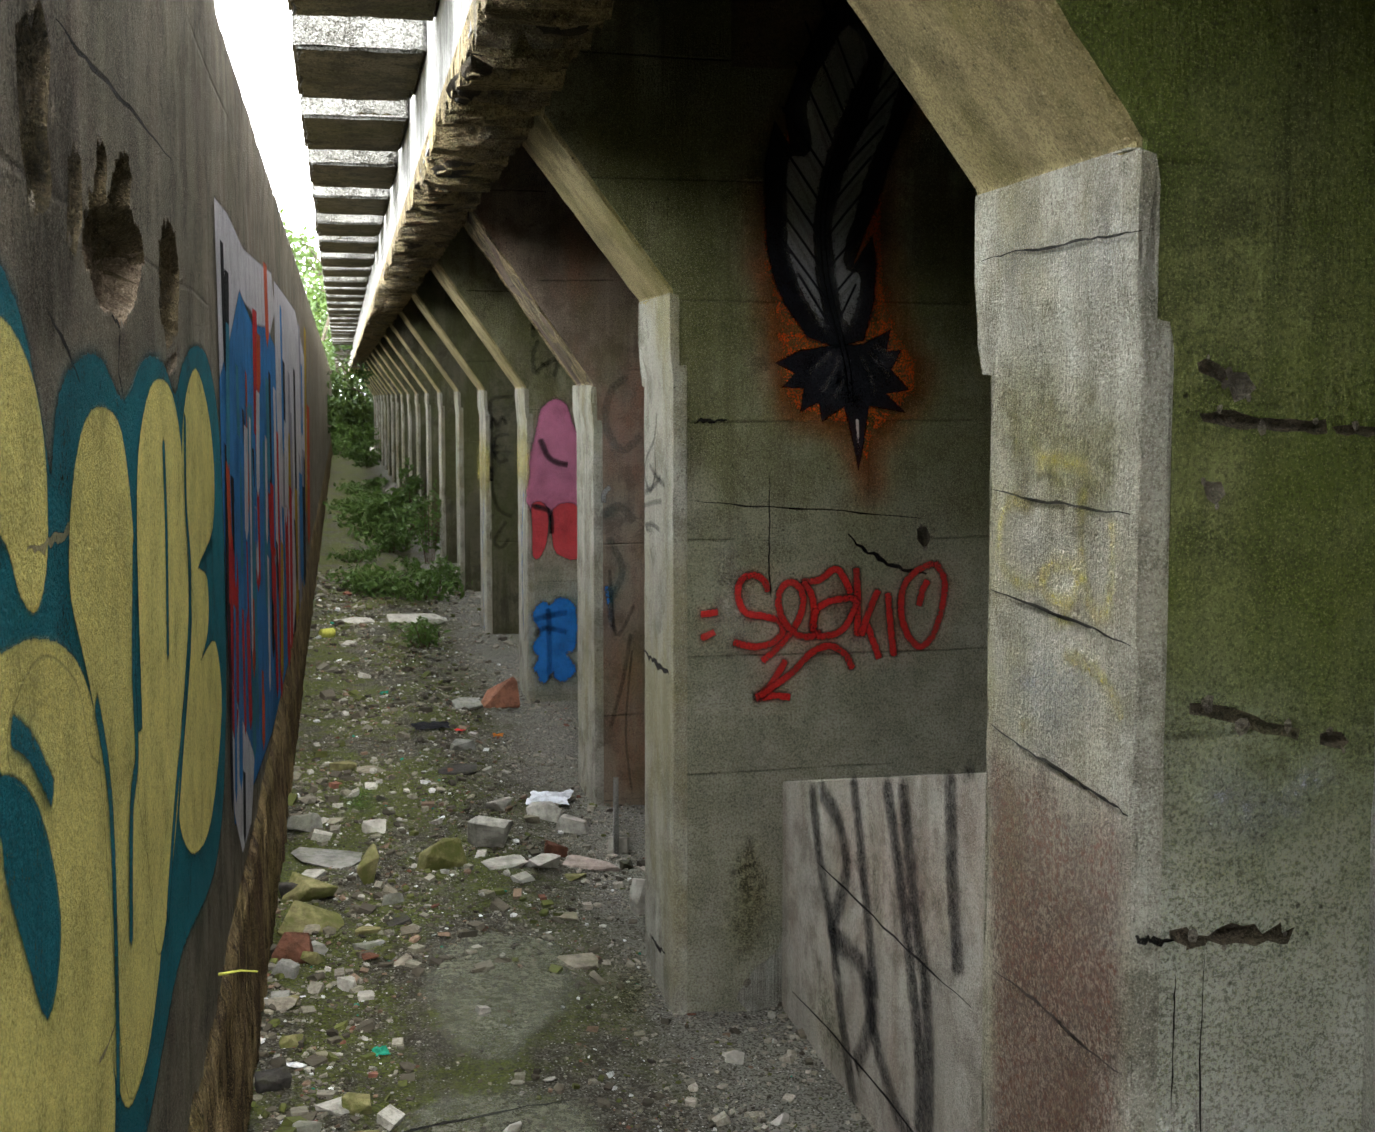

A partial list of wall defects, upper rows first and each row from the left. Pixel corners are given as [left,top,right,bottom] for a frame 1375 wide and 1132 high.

spalling [446,53,500,105]
spalling [15,0,183,376]
spalling [431,160,476,184]
crack [981,230,1143,262]
spalling [1197,354,1375,438]
crack [697,475,927,596]
spalling [1189,695,1300,741]
spalling [1320,727,1349,753]
spalling [1135,923,1294,951]